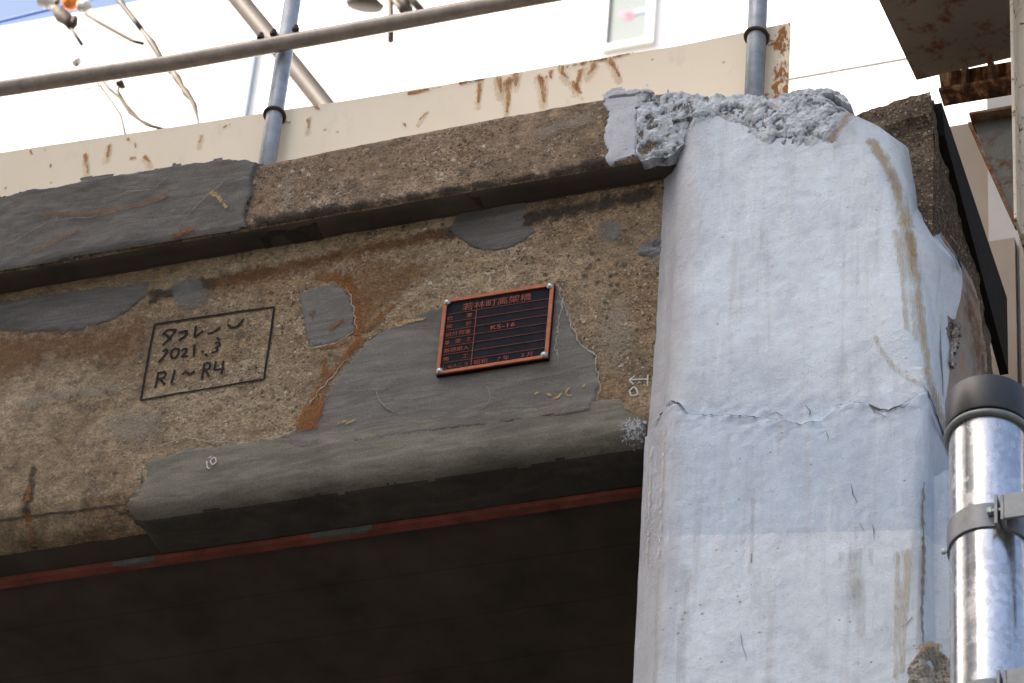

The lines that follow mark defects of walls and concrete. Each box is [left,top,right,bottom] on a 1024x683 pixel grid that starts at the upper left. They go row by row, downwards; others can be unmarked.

rust [459,72,518,113]
rust [537,52,634,102]
spalling [671,88,855,147]
rust [291,272,395,431]
crack [654,387,944,438]
rust [22,466,36,544]
spalling [908,641,950,683]